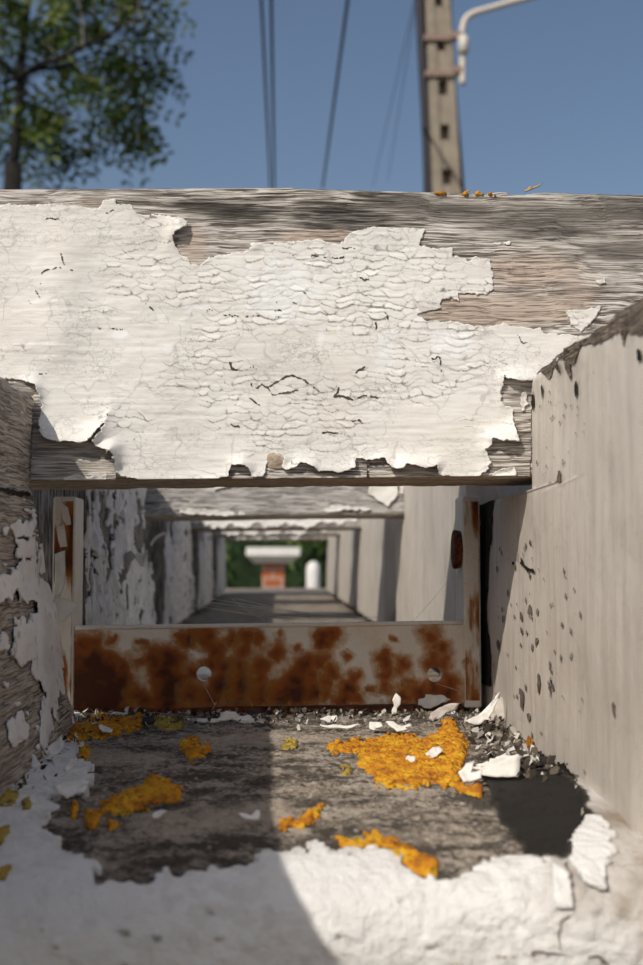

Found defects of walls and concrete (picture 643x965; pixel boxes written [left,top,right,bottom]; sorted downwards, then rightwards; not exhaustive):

peeling [0,188,643,482]
peeling [54,503,71,599]
rust [54,501,73,591]
peeling [106,550,137,584]
rust [464,501,478,534]
rust [469,592,479,631]
peeling [498,589,547,651]
rust [62,624,480,708]
peeling [31,734,63,768]
spalling [42,649,572,885]
crack [531,862,609,965]